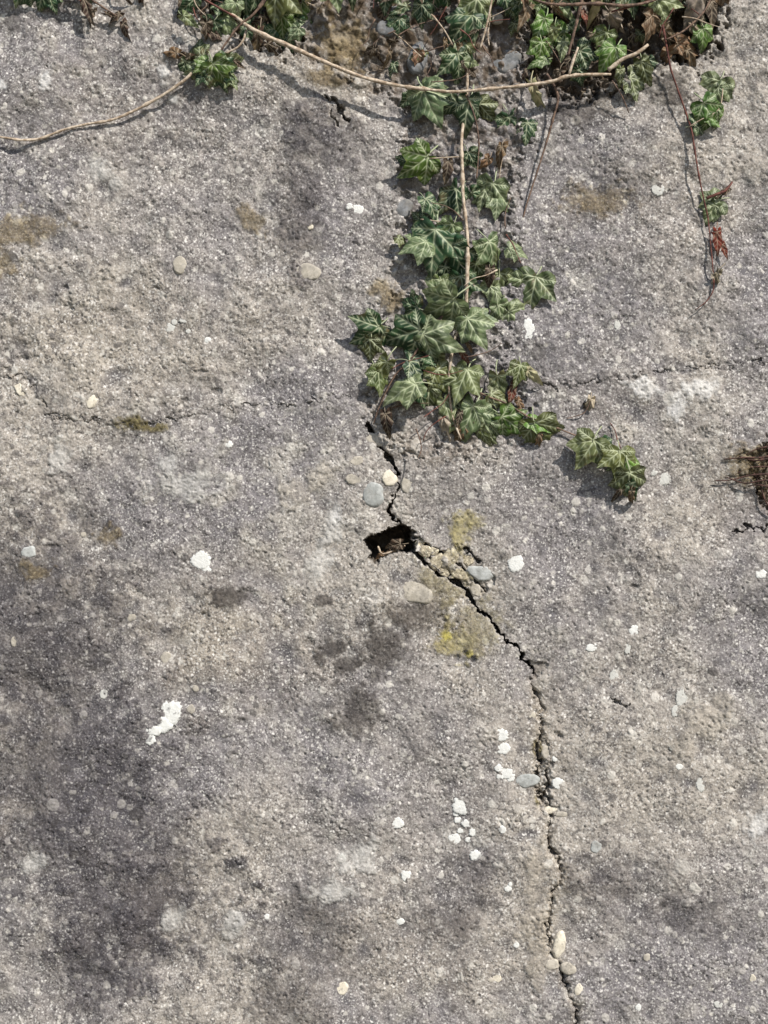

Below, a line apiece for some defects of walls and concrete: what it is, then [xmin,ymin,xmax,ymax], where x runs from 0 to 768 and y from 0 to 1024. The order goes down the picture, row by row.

crack [3,367,196,428]
crack [226,391,579,1024]